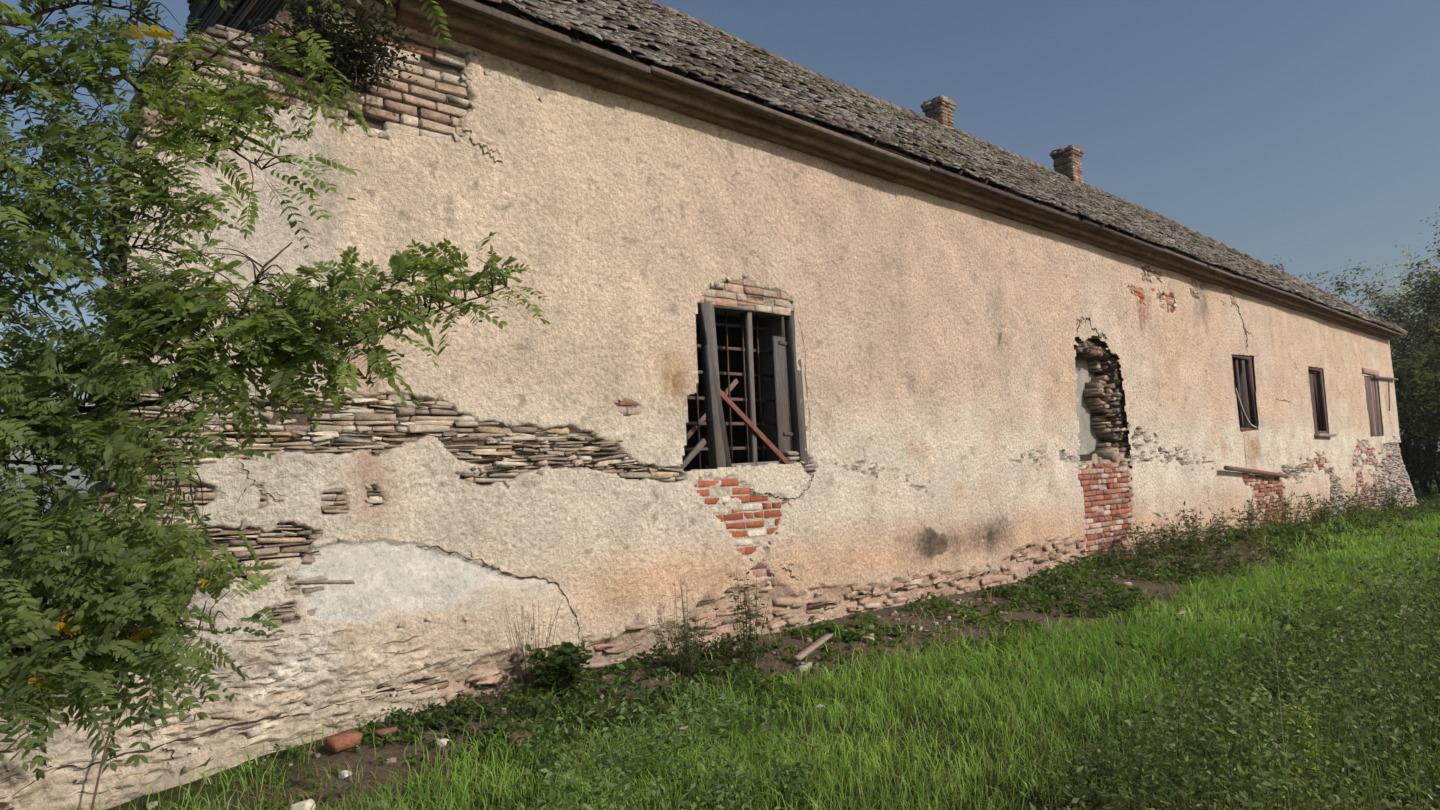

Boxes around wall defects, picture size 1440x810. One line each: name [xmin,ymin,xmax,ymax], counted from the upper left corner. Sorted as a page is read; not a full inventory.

spalling [146,19,555,142]
spalling [697,273,795,317]
spalling [1242,437,1417,526]
spalling [0,383,1239,810]